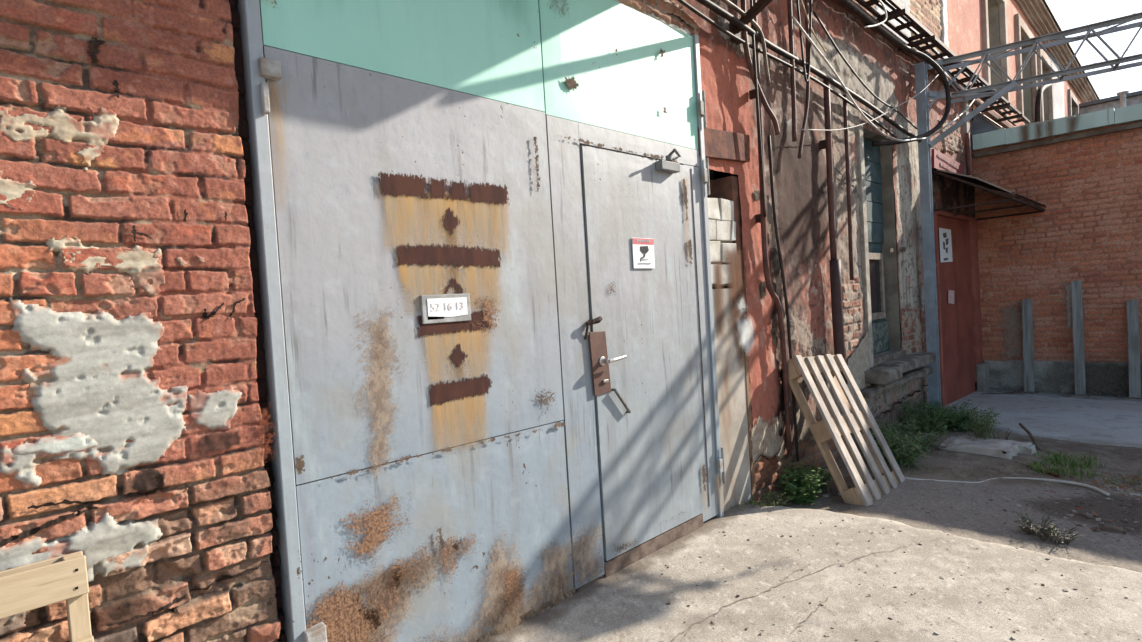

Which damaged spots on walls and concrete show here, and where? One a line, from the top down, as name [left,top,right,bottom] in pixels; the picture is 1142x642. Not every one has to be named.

spalling [0,104,120,171]
spalling [0,171,39,209]
peeling [790,306,828,356]
spalling [842,276,862,359]
peeling [12,433,98,455]
peeling [188,387,242,454]
rust [357,313,404,473]
peeling [751,416,785,487]
rust [305,492,605,642]
crack [670,537,946,642]